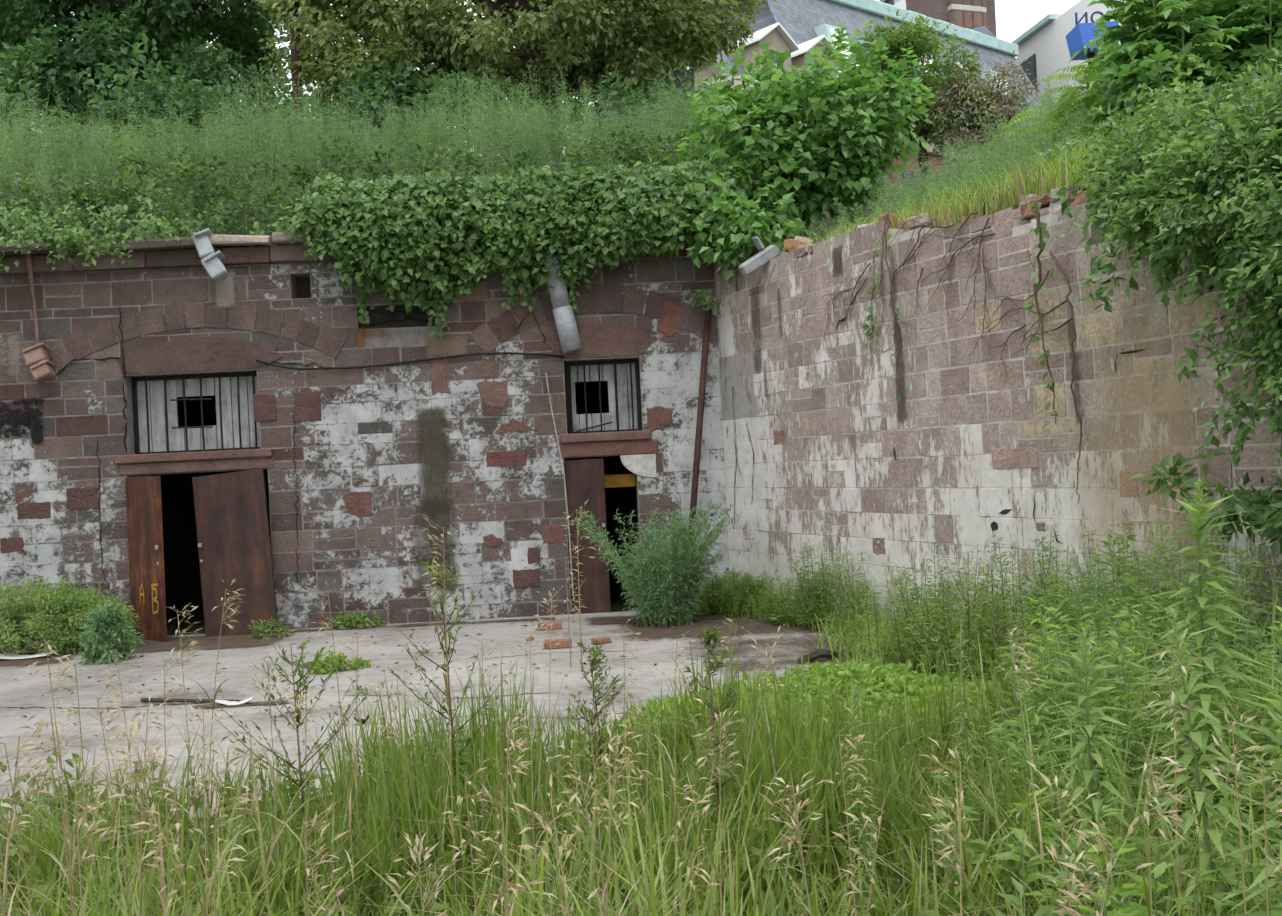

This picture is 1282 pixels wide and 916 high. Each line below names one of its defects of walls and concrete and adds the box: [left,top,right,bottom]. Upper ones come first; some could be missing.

peeling [225,262,356,343]
leakage [0,396,44,444]
peeling [0,425,130,643]
peeling [62,375,104,415]
peeling [252,341,564,629]
leakage [416,407,456,590]